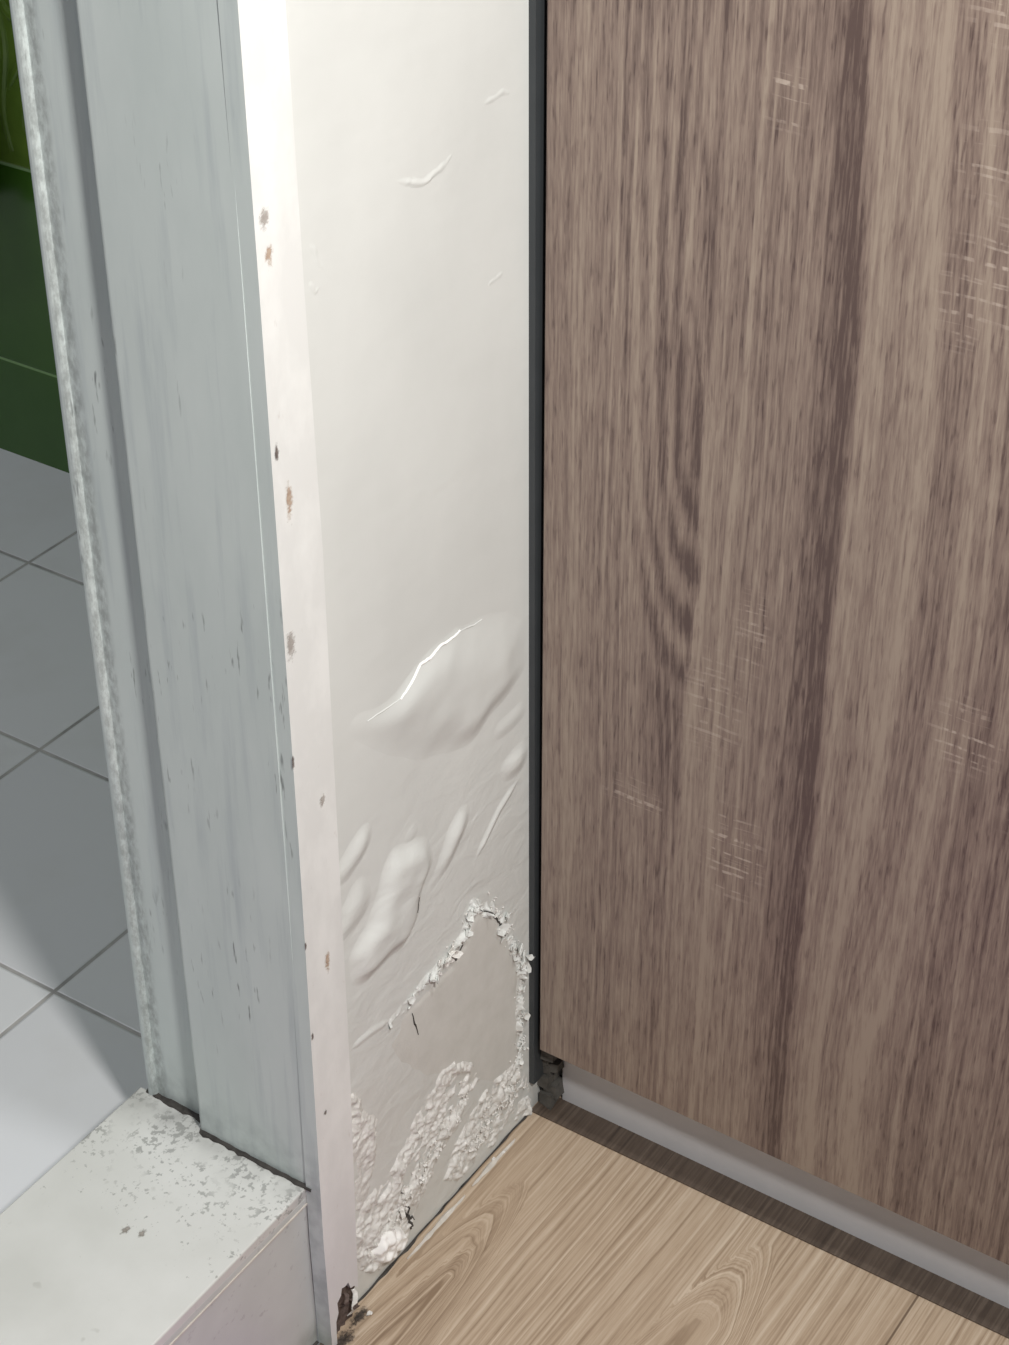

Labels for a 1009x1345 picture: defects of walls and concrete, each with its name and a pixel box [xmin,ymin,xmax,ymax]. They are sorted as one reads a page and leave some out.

peeling [388,891,535,1082]